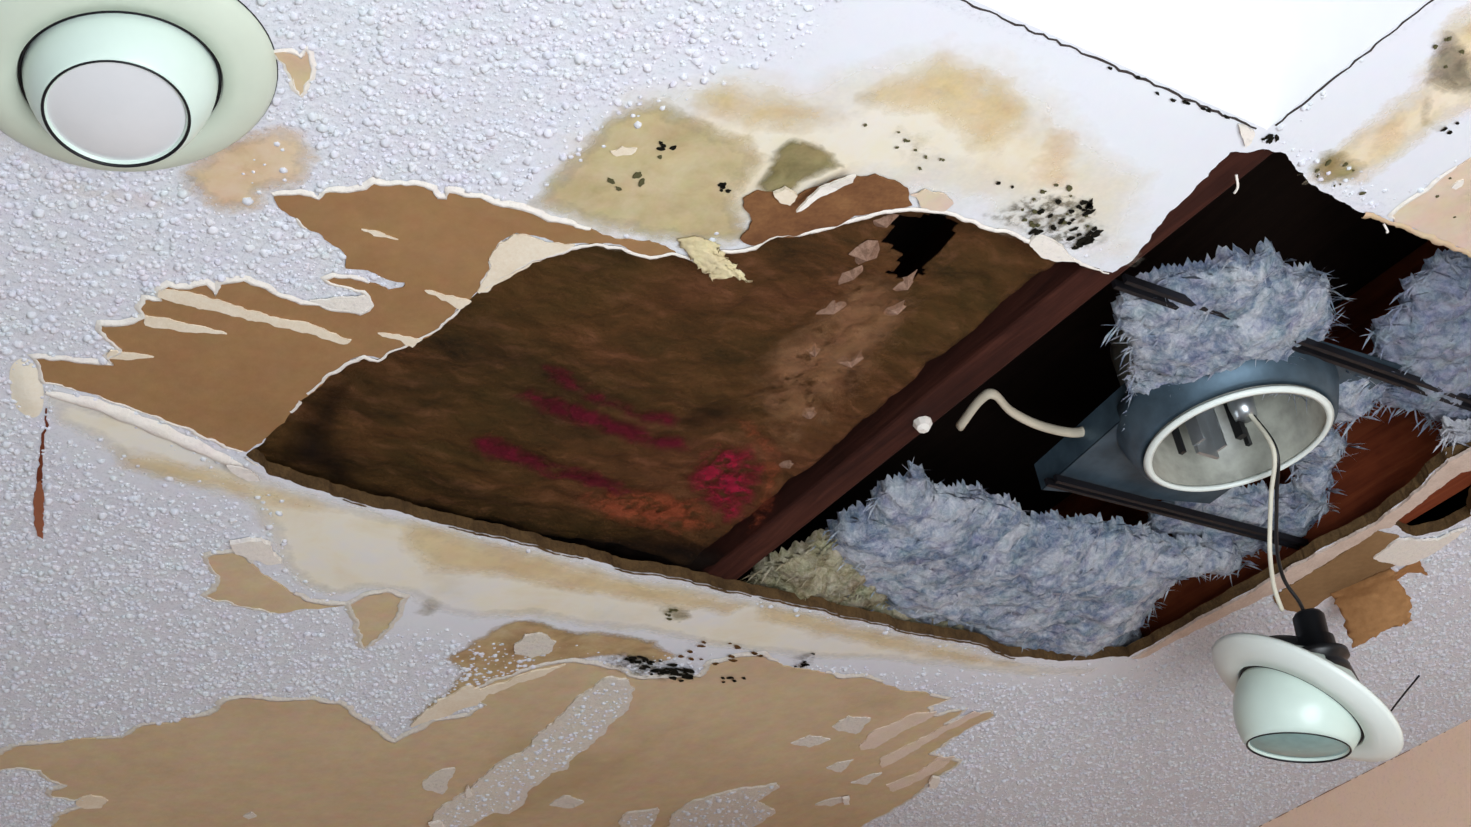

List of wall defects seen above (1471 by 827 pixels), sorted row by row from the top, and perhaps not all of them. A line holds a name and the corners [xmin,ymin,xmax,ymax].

leakage [544,64,1124,250]
peeling [740,173,954,246]
peeling [1029,234,1075,262]
leakage [1315,23,1471,195]
peeling [27,177,675,481]
leakage [477,438,693,522]
leakage [692,451,756,518]
peeling [199,537,411,649]
leakage [590,541,720,571]
spalling [1132,447,1471,659]
leakage [411,621,763,727]
peeling [0,651,994,827]